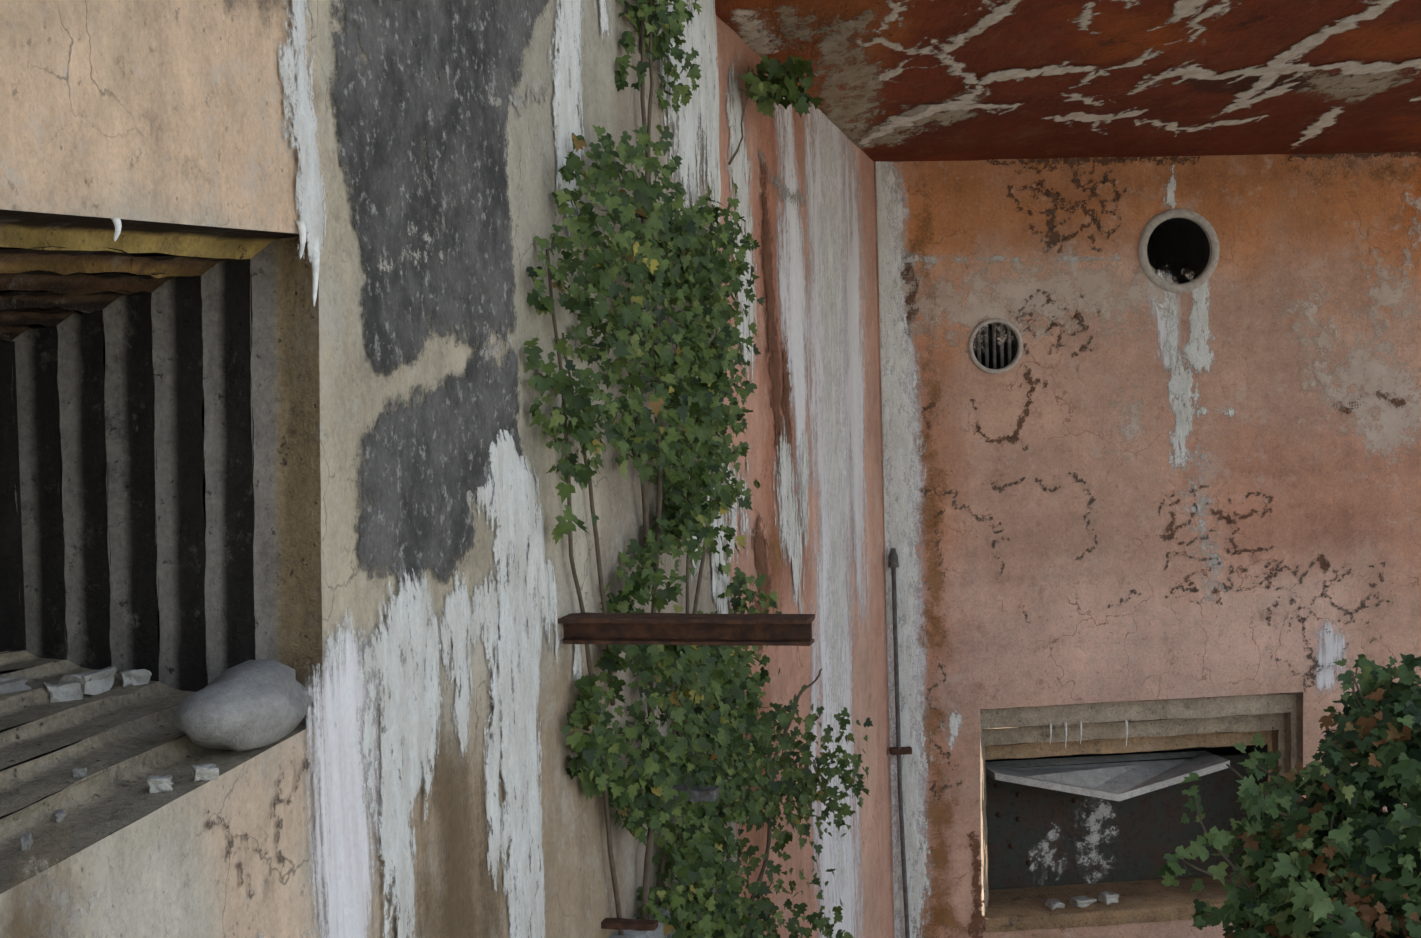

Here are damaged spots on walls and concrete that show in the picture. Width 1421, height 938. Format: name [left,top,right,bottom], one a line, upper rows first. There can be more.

crack [900,266,921,334]
crack [1006,162,1127,253]
damp [655,0,1235,938]
crack [922,289,1101,578]
damp [303,429,584,938]
crack [1108,485,1393,696]
damp [1315,620,1347,691]